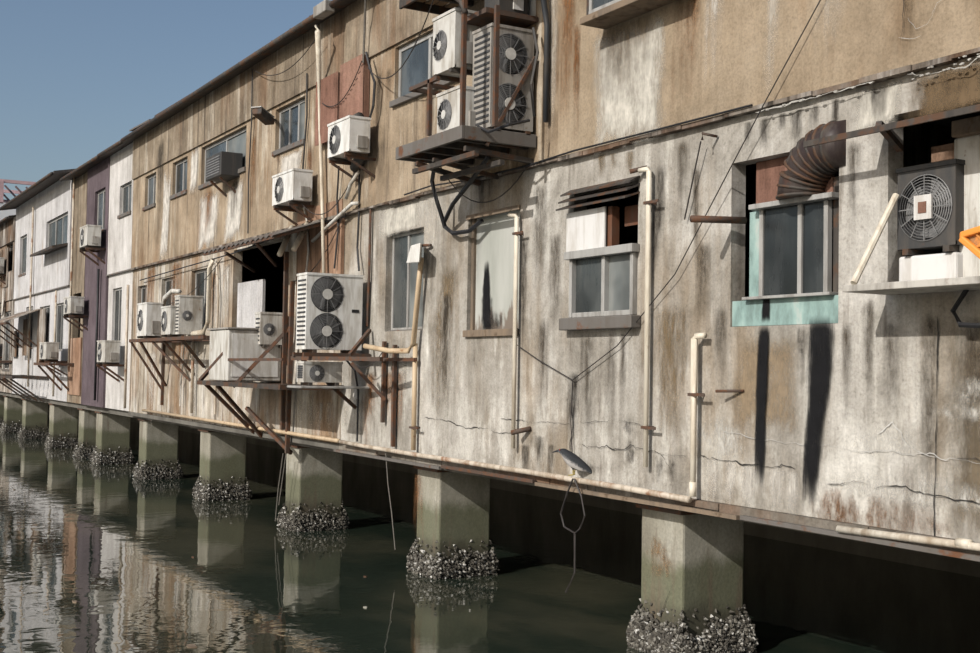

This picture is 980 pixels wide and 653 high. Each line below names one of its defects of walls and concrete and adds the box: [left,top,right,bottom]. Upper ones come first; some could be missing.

spalling [907,53,980,80]
crack [426,375,803,469]
damp [738,295,850,498]
crack [826,444,980,464]
crack [829,479,980,506]
damp [924,317,948,537]
damp [958,330,980,526]